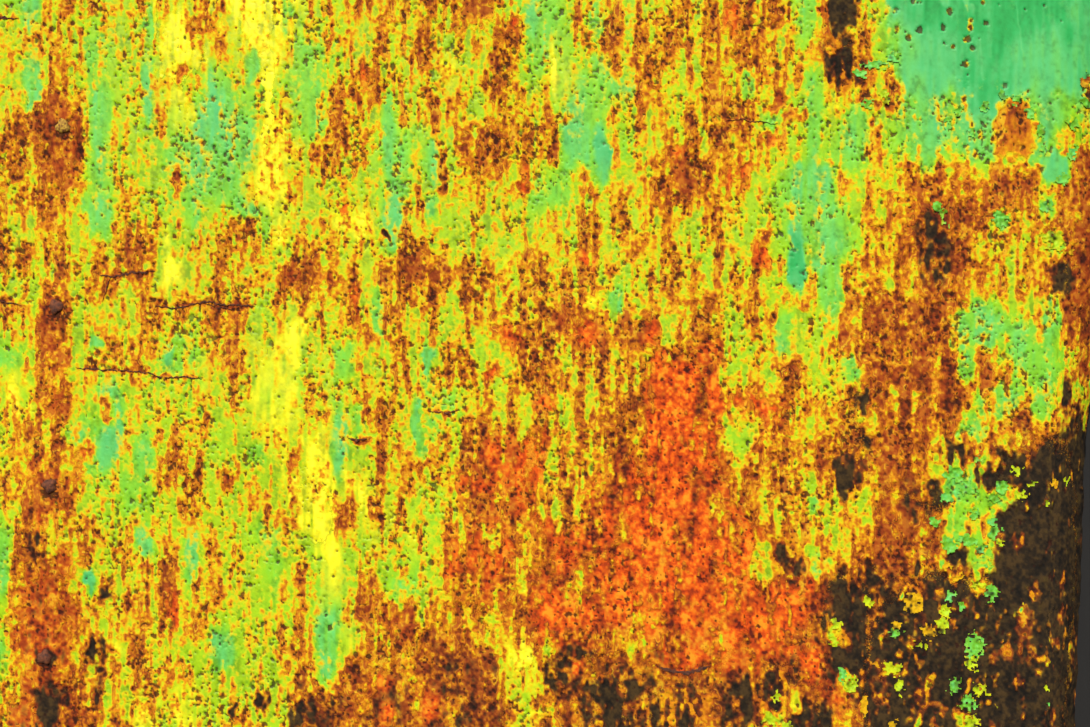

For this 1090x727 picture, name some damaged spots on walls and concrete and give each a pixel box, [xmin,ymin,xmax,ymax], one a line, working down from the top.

corrosion [750,223,779,275]
crack [155,301,253,310]
corrosion [0,0,98,727]
crack [79,368,202,380]
corrosion [346,285,862,727]
peeling [887,455,1071,650]
corrosion [991,609,1037,661]
corrosion [1047,603,1069,653]
peeling [752,689,793,727]
peeling [838,667,868,718]
peeling [872,660,906,698]
peeling [946,629,991,727]